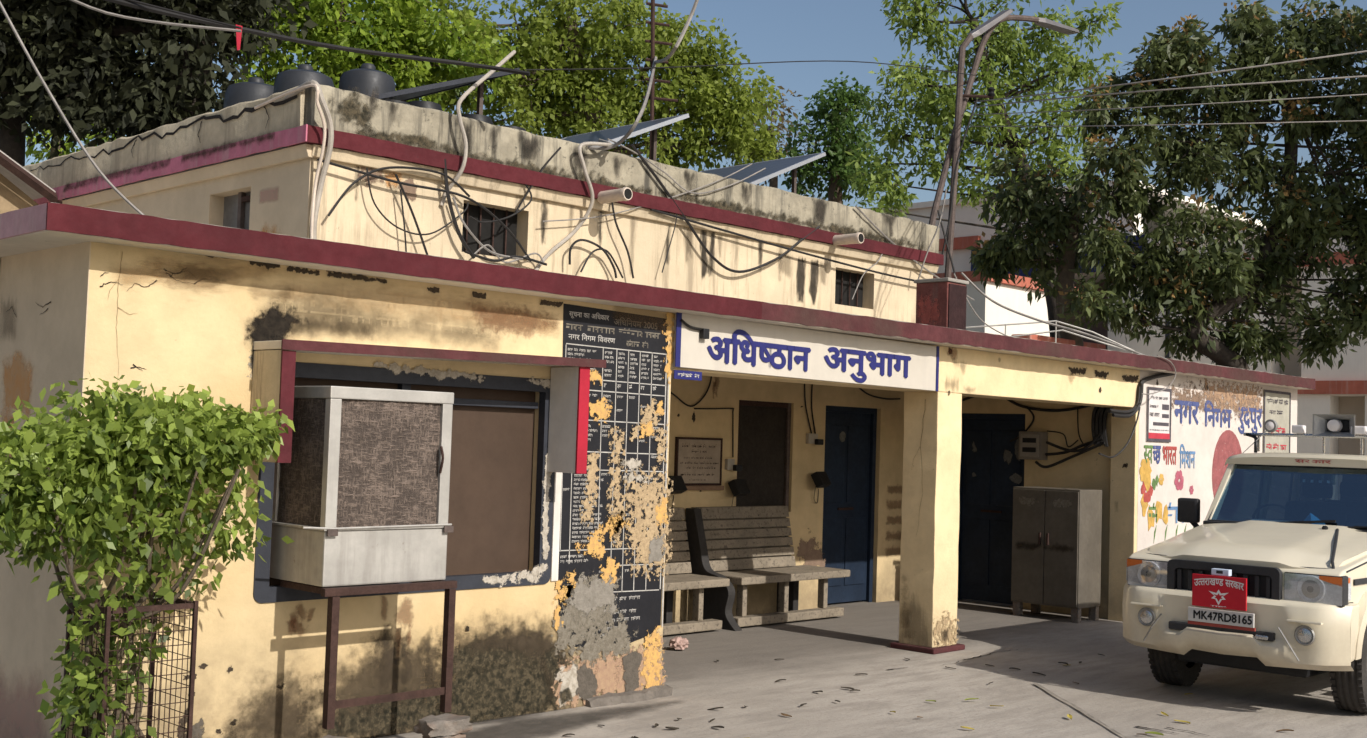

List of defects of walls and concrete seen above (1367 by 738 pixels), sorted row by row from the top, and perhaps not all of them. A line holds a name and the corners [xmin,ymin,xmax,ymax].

water stain [329,88,924,250]
crack [100,252,212,380]
peeling [373,362,485,383]
water stain [700,230,715,277]
water stain [797,258,819,304]
peeling [482,369,695,710]
water stain [377,622,650,738]